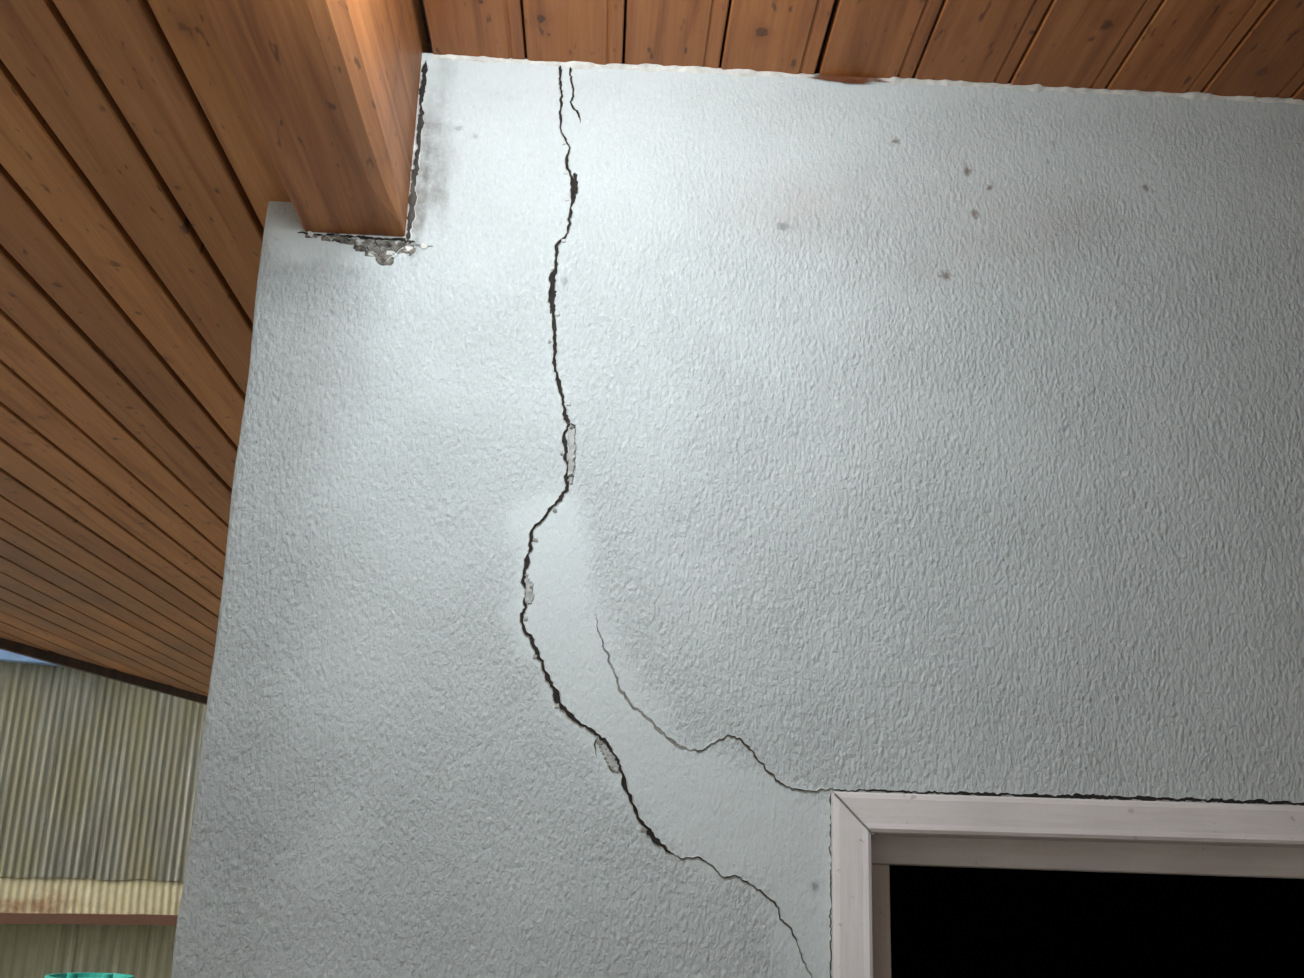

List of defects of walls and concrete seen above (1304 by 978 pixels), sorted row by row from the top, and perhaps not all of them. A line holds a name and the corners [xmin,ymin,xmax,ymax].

flaking render [305,231,428,266]
crack [519,65,1304,978]